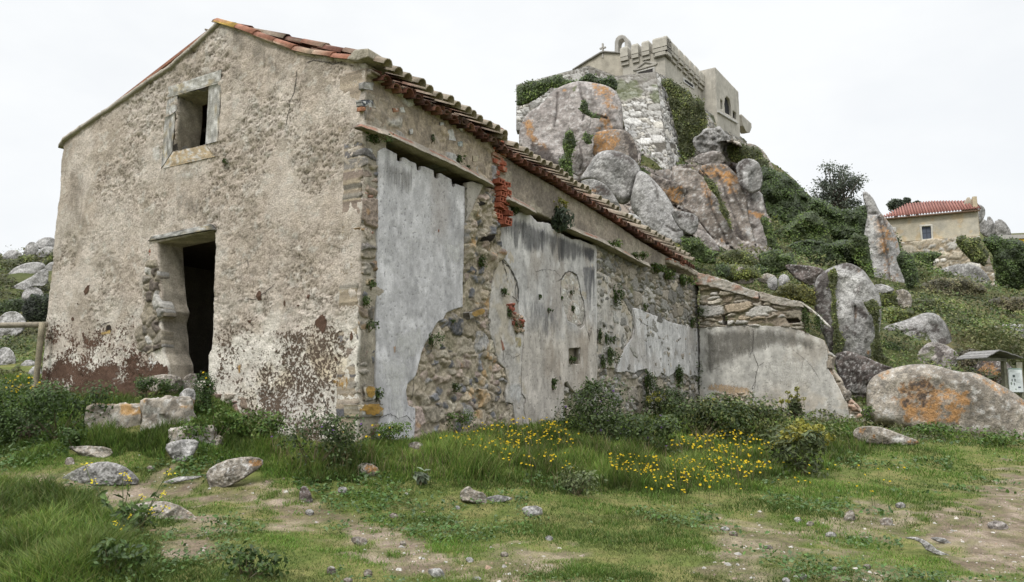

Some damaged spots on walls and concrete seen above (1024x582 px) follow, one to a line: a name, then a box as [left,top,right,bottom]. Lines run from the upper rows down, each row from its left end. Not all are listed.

crack [286,57,343,125]
peeling [41,246,177,400]
peeling [213,294,353,442]
spalling [406,186,526,439]
damp [506,221,594,296]